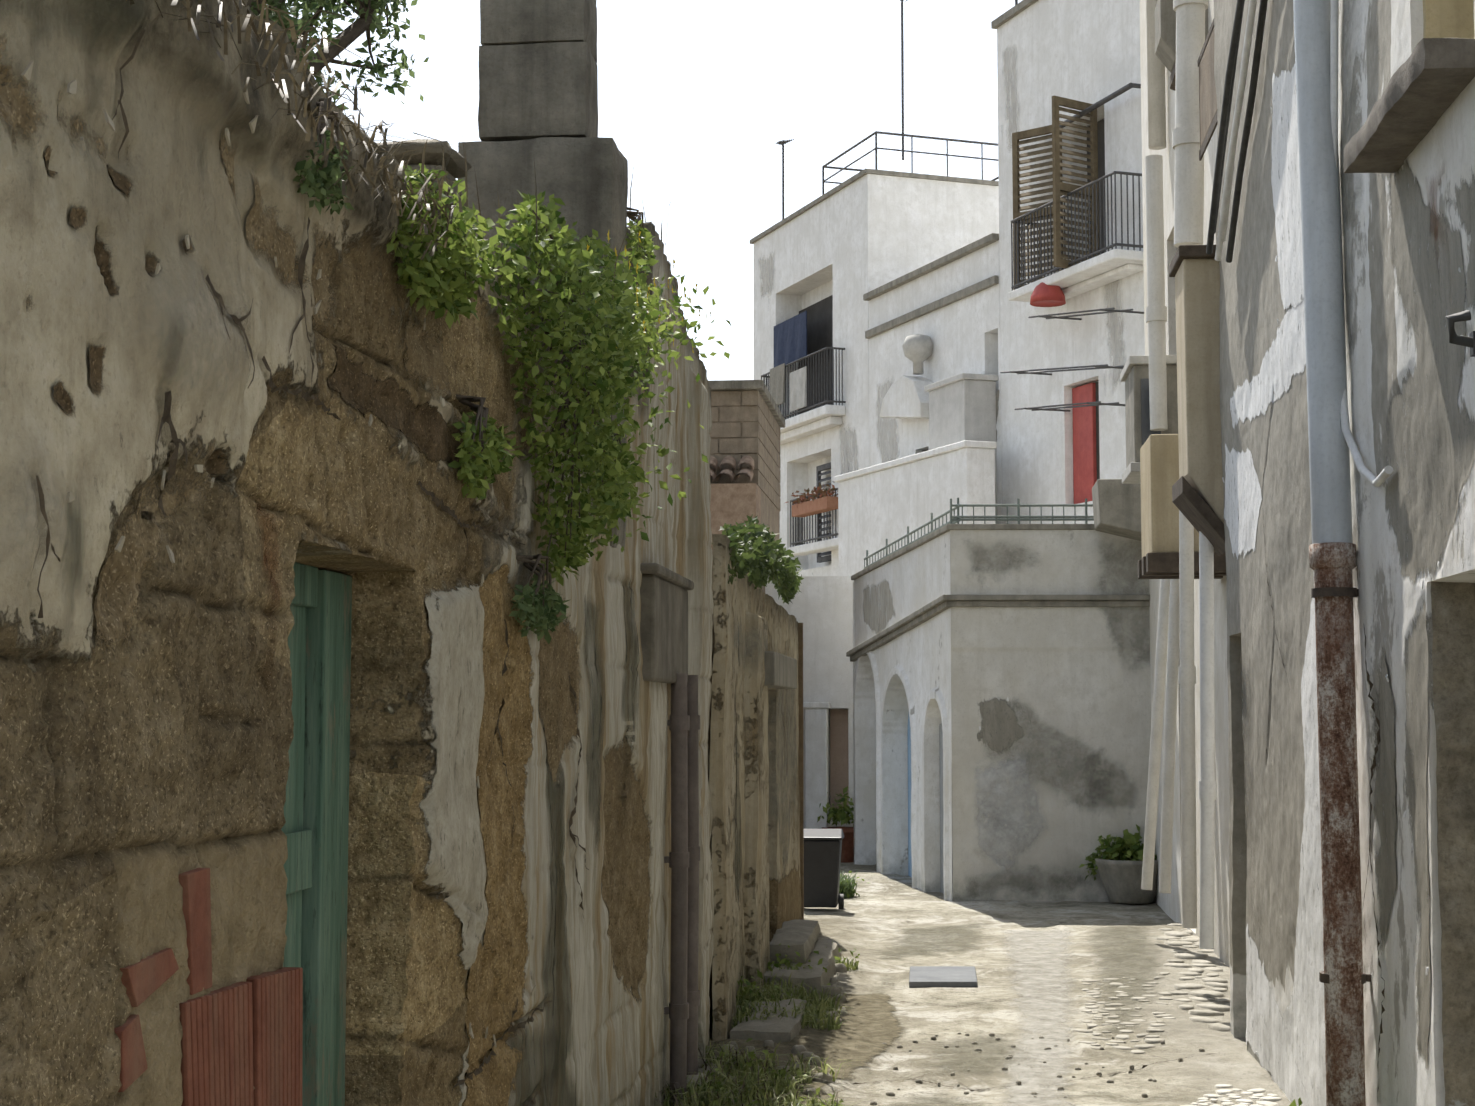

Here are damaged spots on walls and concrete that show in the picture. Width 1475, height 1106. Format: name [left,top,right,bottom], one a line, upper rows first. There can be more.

crack [112,29,145,160]
peeling [243,86,258,133]
spalling [53,382,75,415]
spalling [69,206,119,296]
spalling [89,344,106,394]
spalling [145,253,159,277]
crack [205,217,341,420]
peeling [219,127,471,463]
peeling [93,447,227,649]
peeling [1371,159,1475,1072]
peeling [601,738,653,1001]